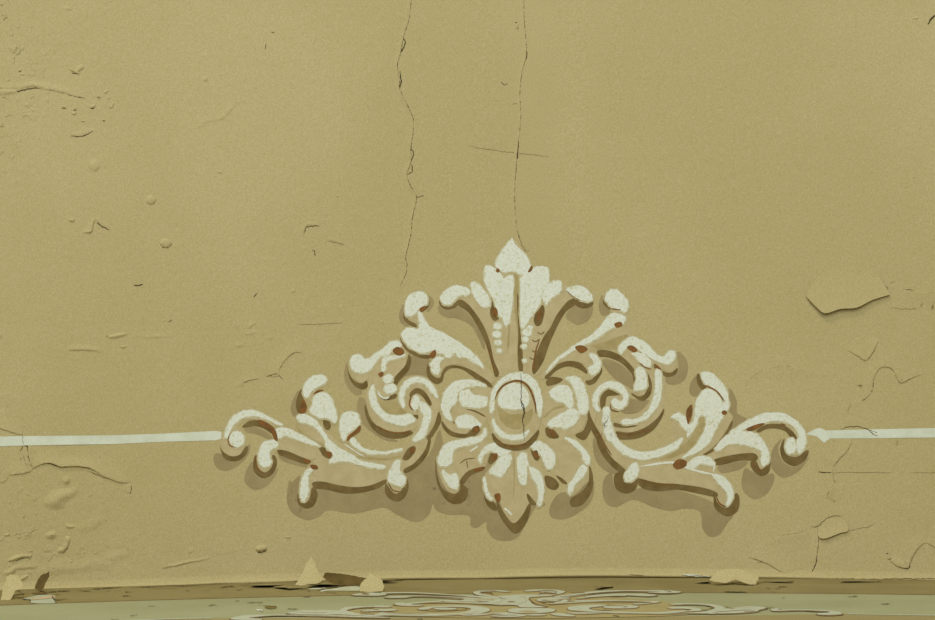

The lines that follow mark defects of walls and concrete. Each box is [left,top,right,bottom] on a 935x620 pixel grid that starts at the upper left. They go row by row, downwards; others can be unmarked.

crack [0,78,84,99]
crack [391,0,421,287]
crack [471,0,549,251]
crack [819,468,935,476]
crack [806,516,874,572]
peeling [1,571,70,604]
peeling [239,557,401,597]